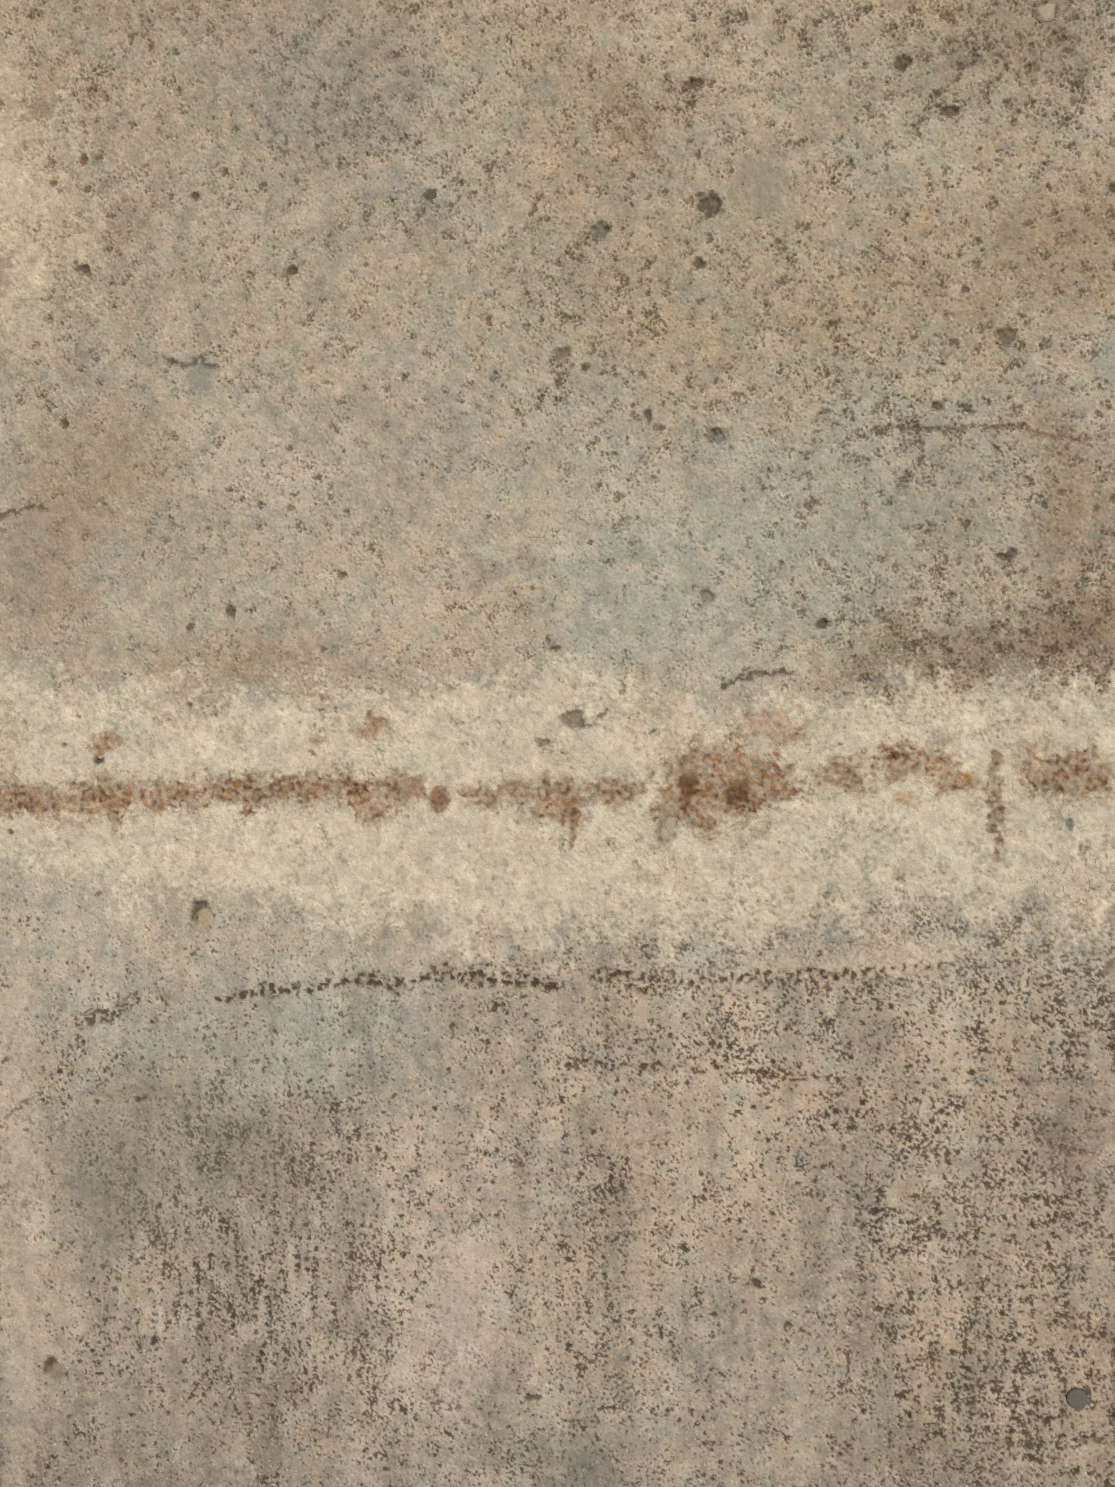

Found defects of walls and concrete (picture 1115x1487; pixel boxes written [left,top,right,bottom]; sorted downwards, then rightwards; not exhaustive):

corrosion [0,692,1115,865]
crack [214,960,956,1005]
crack [70,993,140,1031]